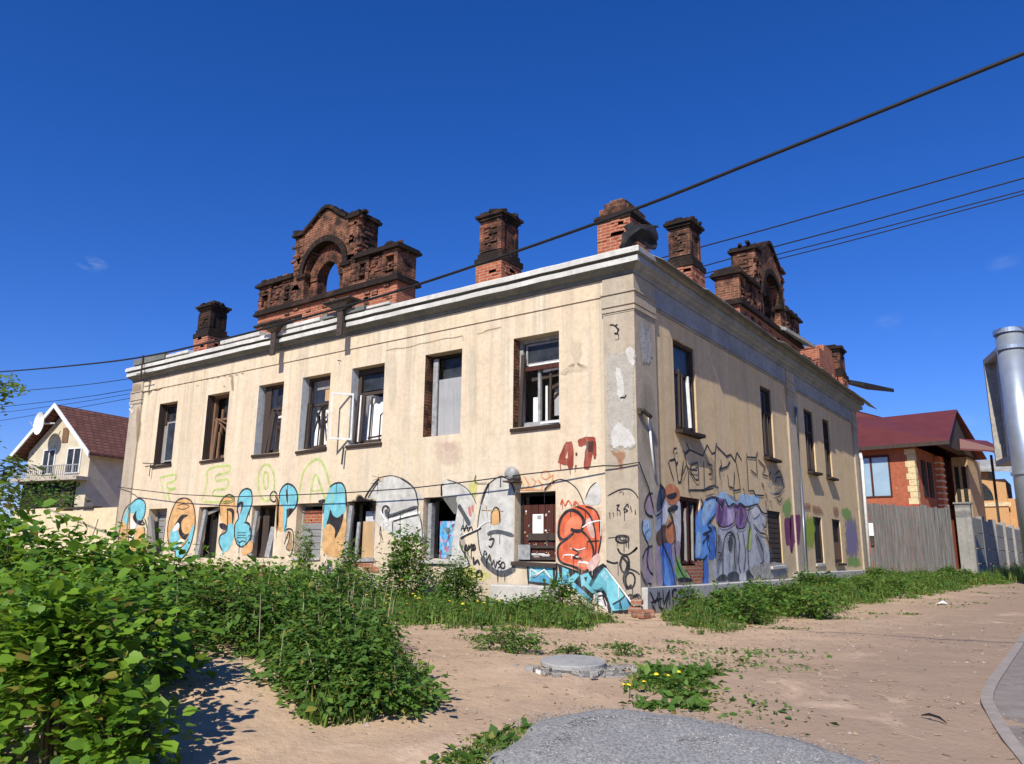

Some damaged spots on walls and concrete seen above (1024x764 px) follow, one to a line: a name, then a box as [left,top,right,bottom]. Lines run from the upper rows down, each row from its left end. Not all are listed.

peeling [606,319,652,451]